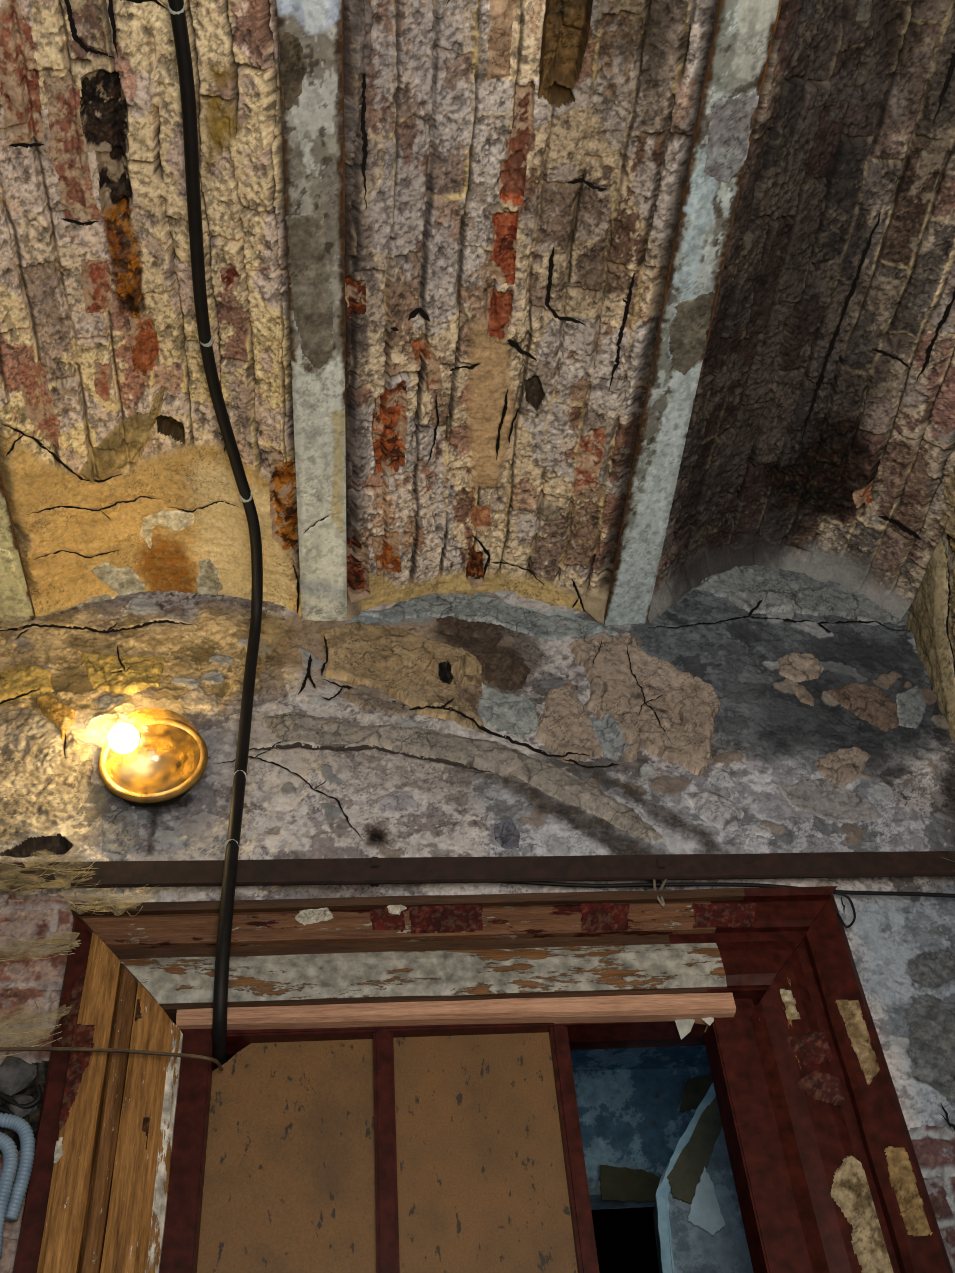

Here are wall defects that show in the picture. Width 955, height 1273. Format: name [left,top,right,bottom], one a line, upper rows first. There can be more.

crack [64,0,168,58]
spalling [0,0,133,220]
spalling [484,0,593,339]
rust [104,199,146,318]
crack [1,423,238,519]
crack [0,620,192,673]
crack [298,636,623,768]
flaking render [320,504,720,777]
crack [208,741,491,840]
flaking render [0,893,104,1273]
peeling [905,947,955,1103]
flaking render [884,1124,955,1273]